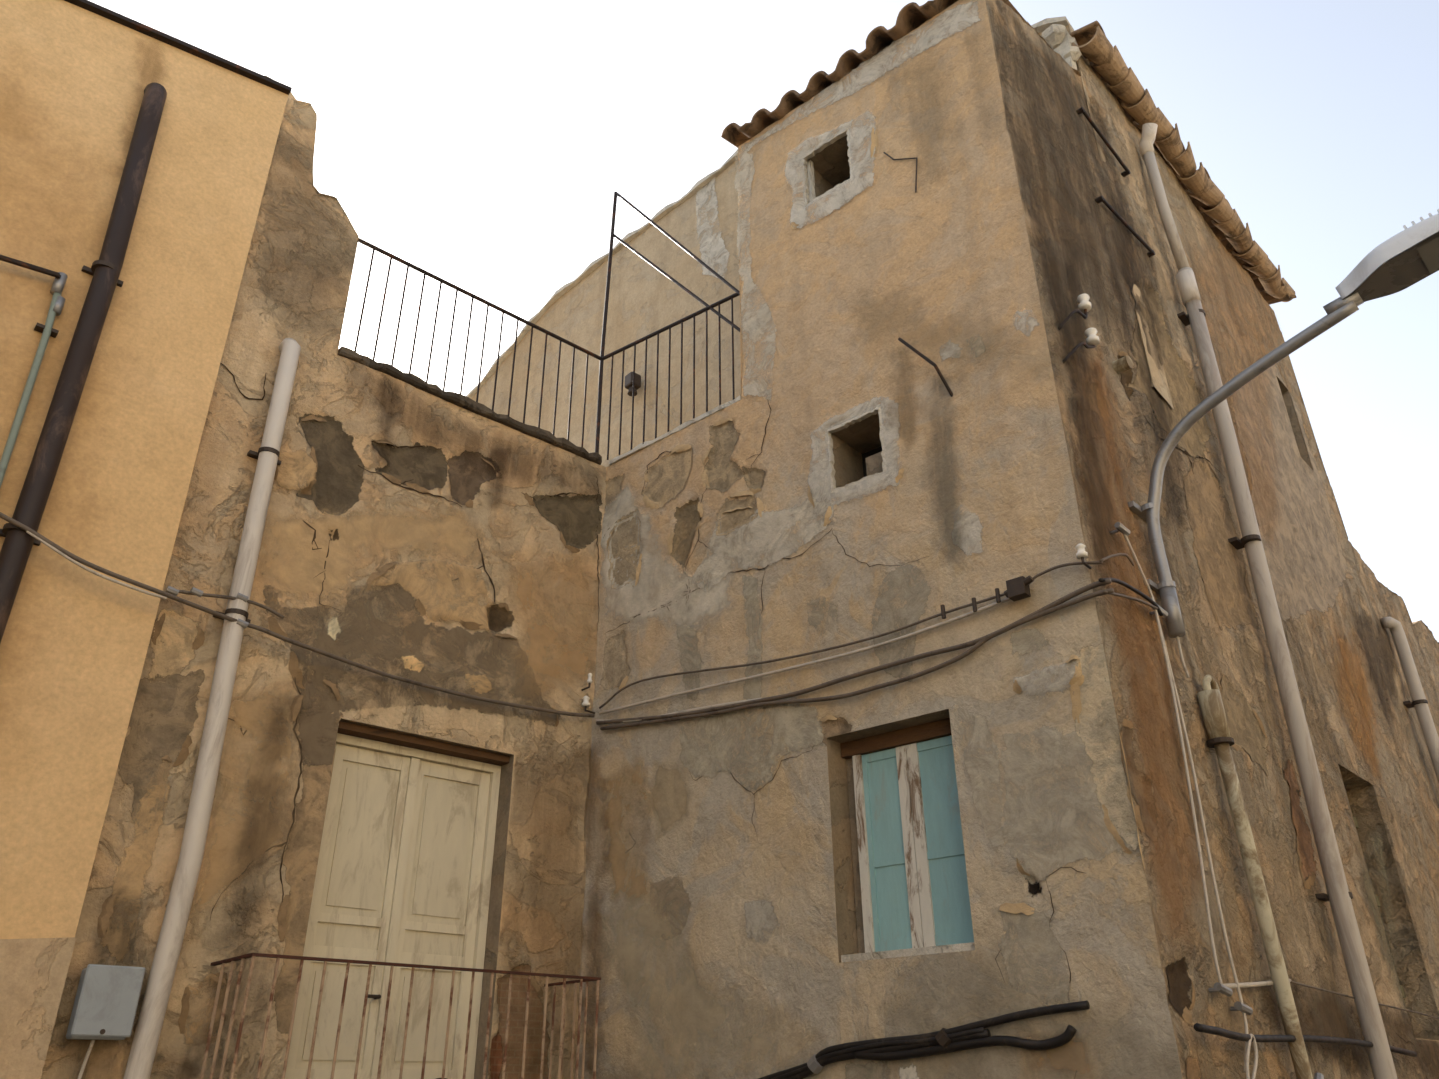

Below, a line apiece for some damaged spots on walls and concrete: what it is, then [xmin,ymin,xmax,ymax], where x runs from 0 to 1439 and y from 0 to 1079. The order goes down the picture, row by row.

peeling [524,418,765,690]
crack [210,678,303,919]
peeling [263,414,560,1034]
crack [1037,867,1084,1000]